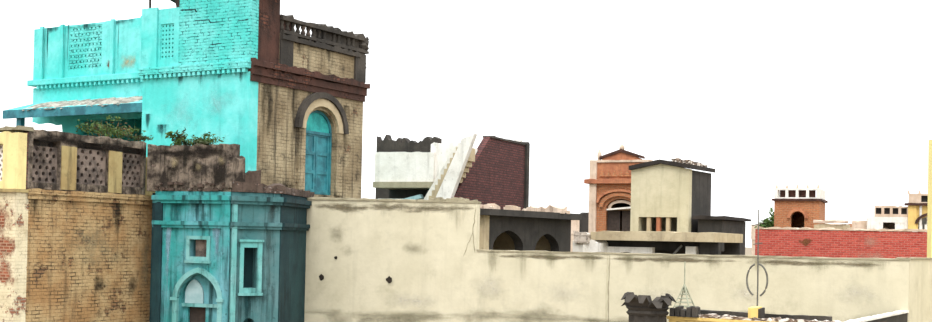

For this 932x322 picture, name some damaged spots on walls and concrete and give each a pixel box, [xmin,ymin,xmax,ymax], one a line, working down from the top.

spalling [0,209,15,284]